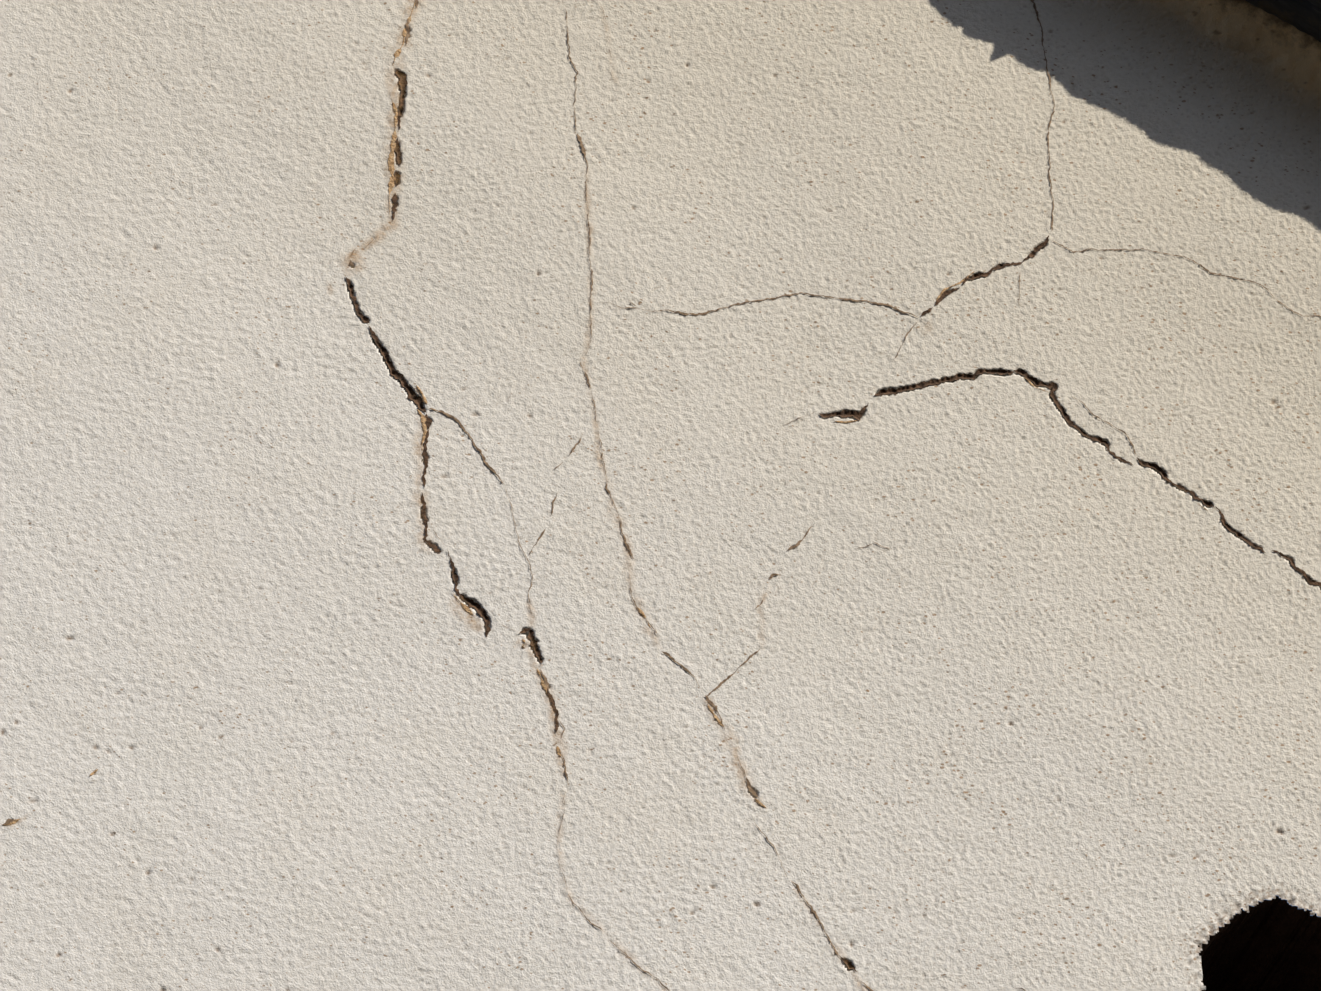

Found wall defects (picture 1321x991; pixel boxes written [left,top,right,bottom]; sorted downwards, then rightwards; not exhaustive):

crack [345,0,1321,991]
spalling [1198,895,1321,991]